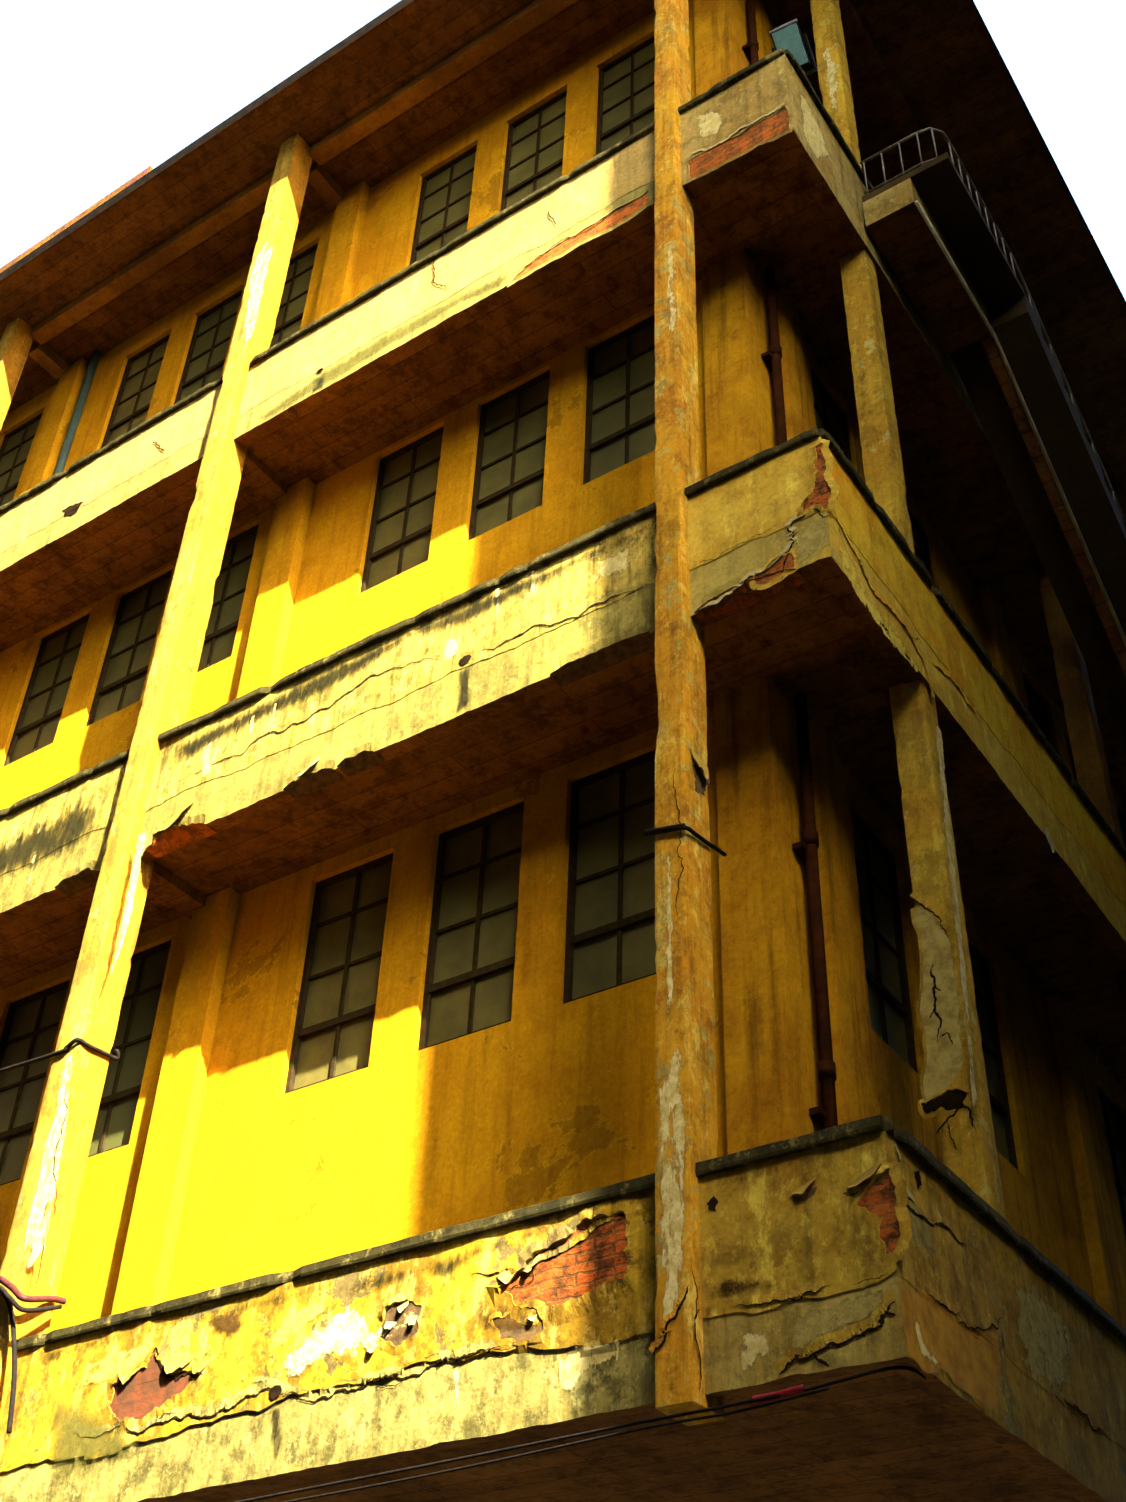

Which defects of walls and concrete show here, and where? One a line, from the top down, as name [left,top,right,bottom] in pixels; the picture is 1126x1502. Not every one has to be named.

flaking render [686,106,793,181]
crack [695,501,977,714]
spalling [283,750,385,800]
spalling [145,798,216,858]
crack [909,891,954,1044]
crack [935,1101,976,1149]
flaking render [485,1047,685,1354]
crack [469,1213,619,1289]
spalling [82,1319,209,1434]
crack [77,1338,514,1438]
peeling [241,1291,429,1382]
crack [648,1263,1001,1387]